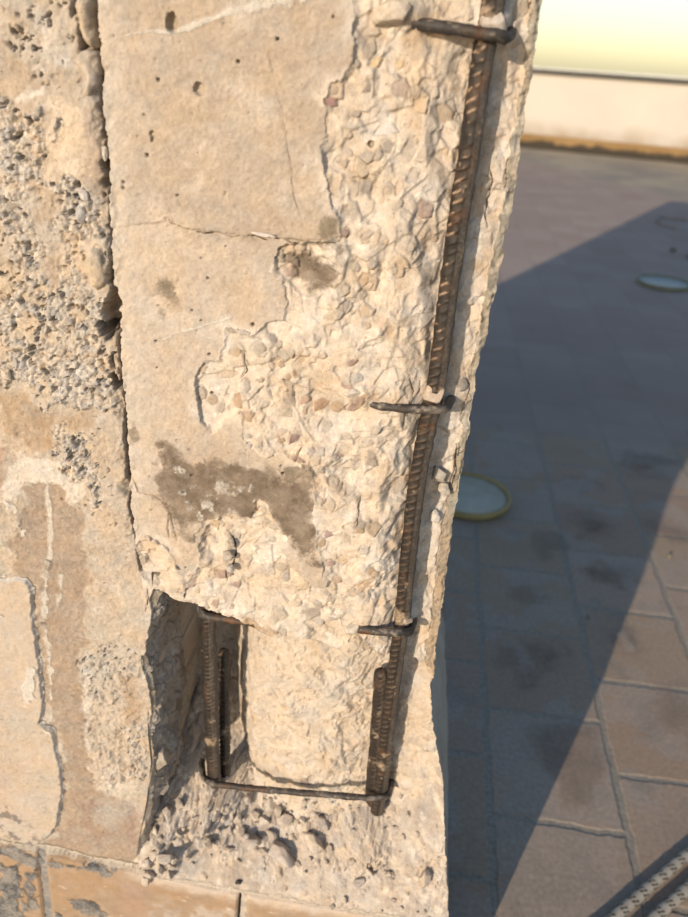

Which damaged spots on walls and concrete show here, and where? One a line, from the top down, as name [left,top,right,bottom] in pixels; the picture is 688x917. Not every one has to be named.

crack [103,158,112,186]
crack [168,219,341,243]
crack [101,249,124,388]
spalling [135,0,533,821]
leakage [155,442,321,567]